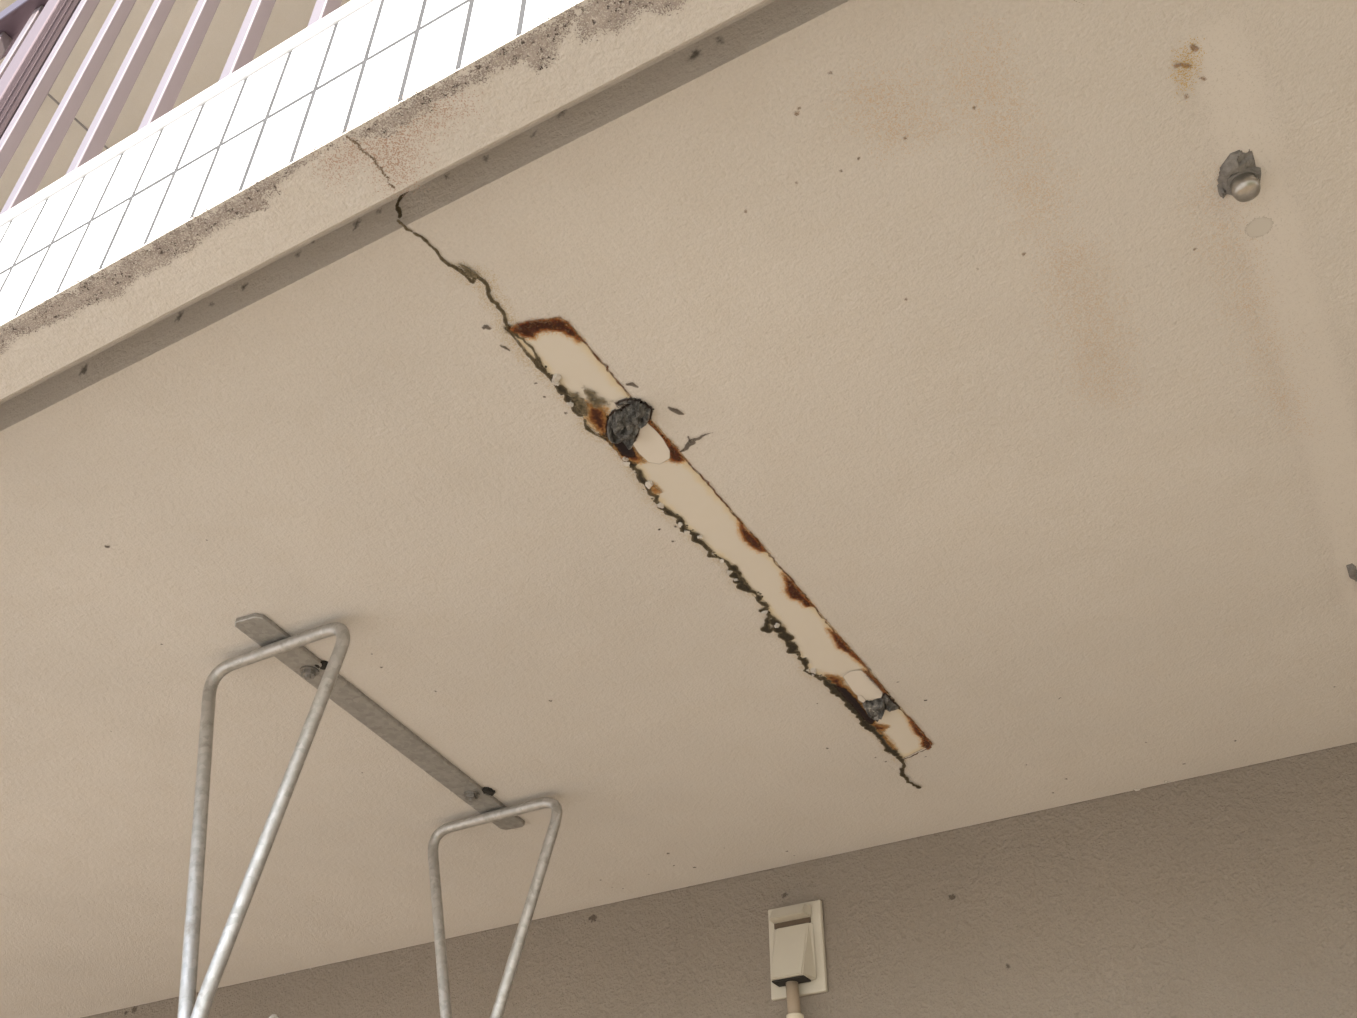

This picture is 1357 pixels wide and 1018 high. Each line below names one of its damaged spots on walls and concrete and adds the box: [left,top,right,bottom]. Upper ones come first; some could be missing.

rust [510,317,631,398]
crack [295,66,921,789]
peeling [500,318,932,759]
rust [584,398,934,750]